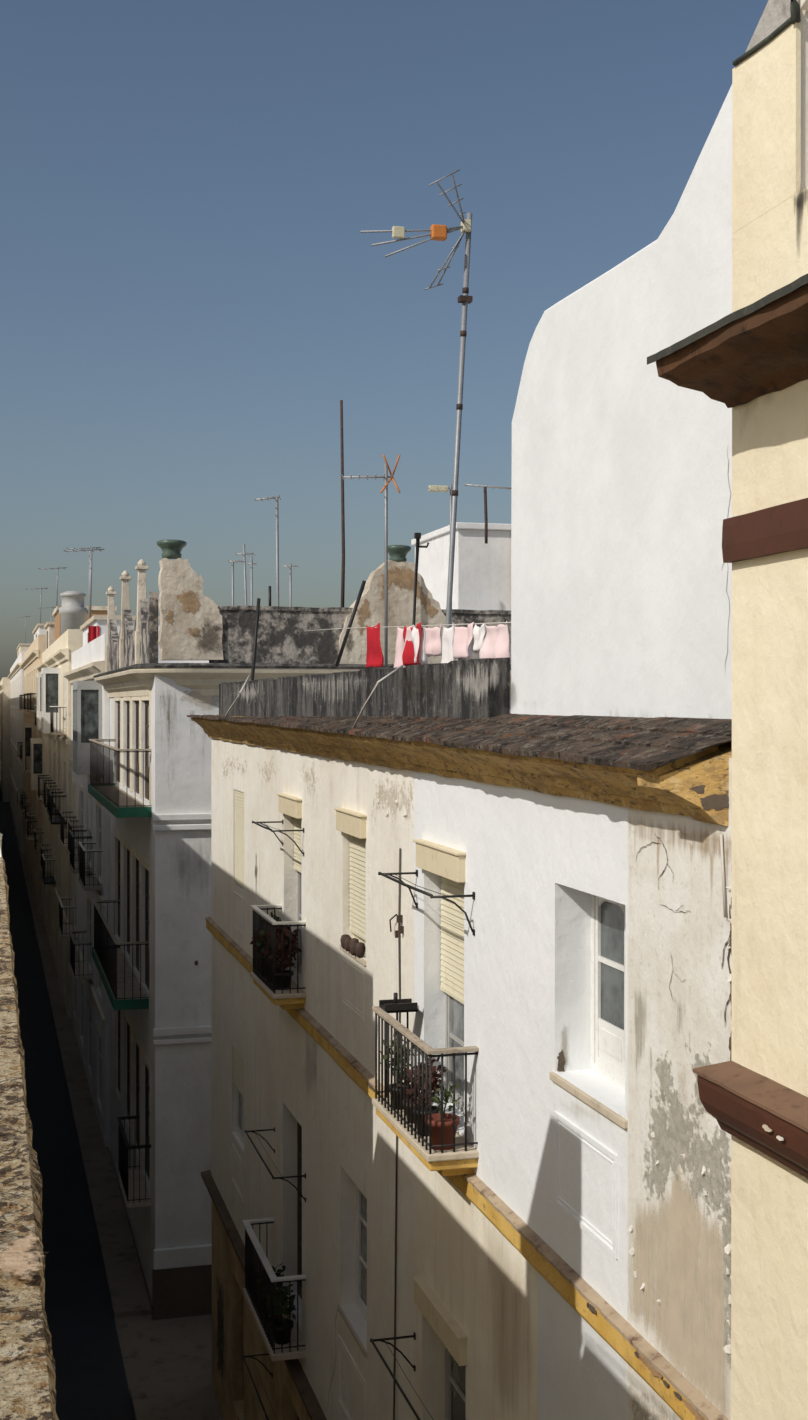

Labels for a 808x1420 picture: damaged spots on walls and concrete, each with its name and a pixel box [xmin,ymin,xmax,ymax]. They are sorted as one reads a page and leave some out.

flaking render [166,590,201,637]
crack [636,834,690,913]
crack [721,904,731,1061]
flaking render [628,1042,731,1420]